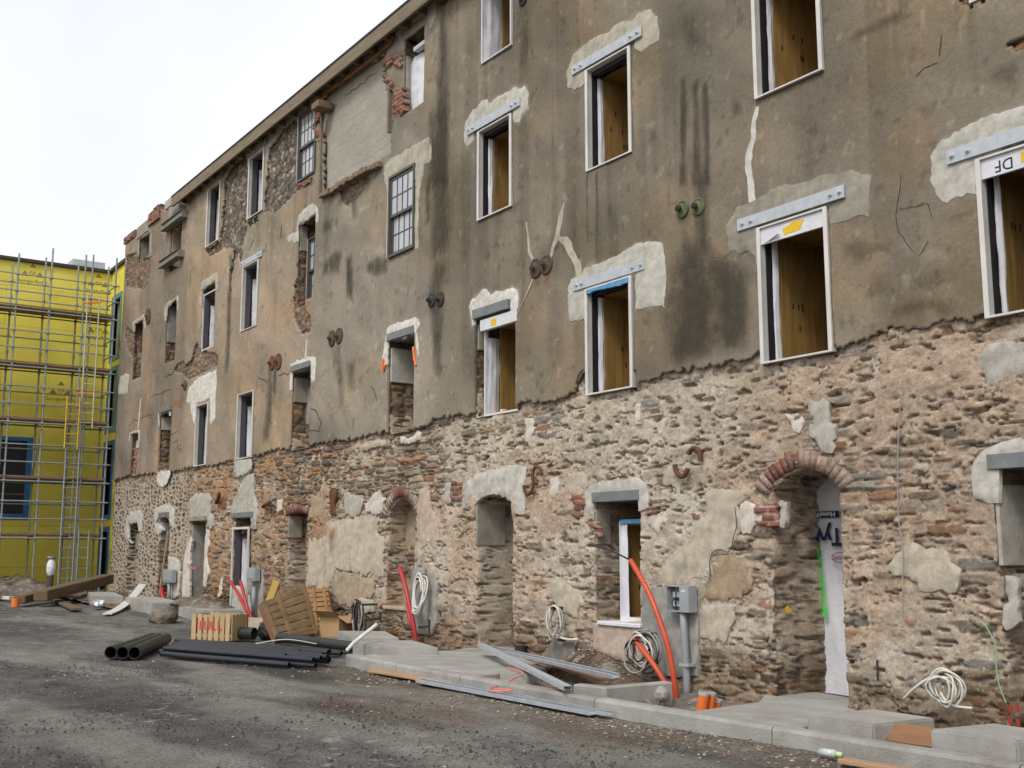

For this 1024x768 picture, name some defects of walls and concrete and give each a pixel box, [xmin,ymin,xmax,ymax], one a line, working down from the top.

spalling [264,119,300,213]
damp [681,81,708,197]
crack [745,107,759,203]
spalling [126,253,150,290]
spalling [294,241,311,334]
crack [516,203,583,317]
damp [670,210,742,354]
crack [895,179,933,256]
spalling [175,345,219,379]